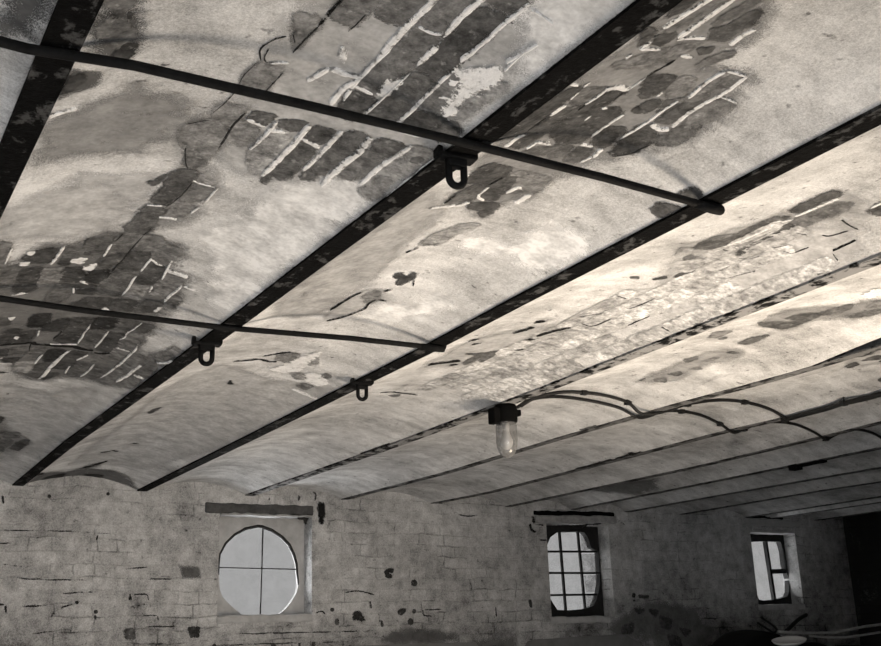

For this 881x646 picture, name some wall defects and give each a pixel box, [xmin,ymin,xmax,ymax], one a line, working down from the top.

crack [107,230,150,278]
crack [165,148,193,208]
crack [186,0,344,149]
flaking render [0,0,553,390]
flaking render [406,0,785,253]
flaking render [418,186,881,403]
flaking render [0,416,38,454]